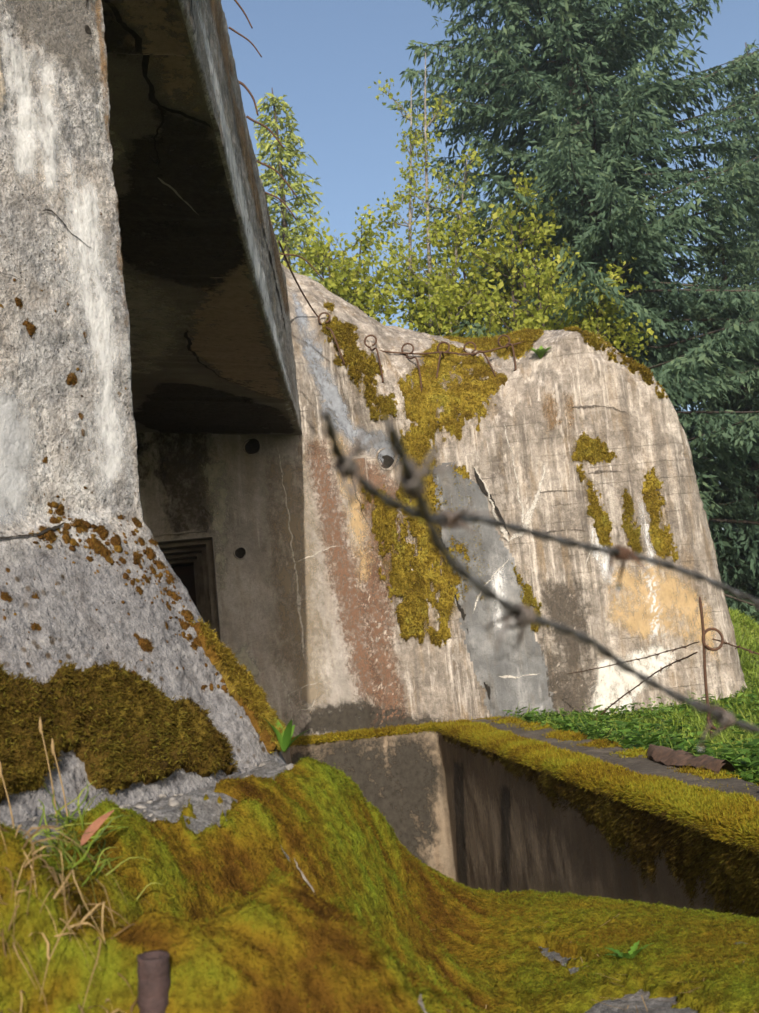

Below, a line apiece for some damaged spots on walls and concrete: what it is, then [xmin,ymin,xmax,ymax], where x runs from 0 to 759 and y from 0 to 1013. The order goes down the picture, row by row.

spalling [1,0,102,91]
crack [85,0,211,170]
damp [103,0,296,537]
crack [473,467,511,537]
damp [474,423,545,542]
damp [267,440,441,864]
damp [473,559,509,628]
damp [450,762,572,891]